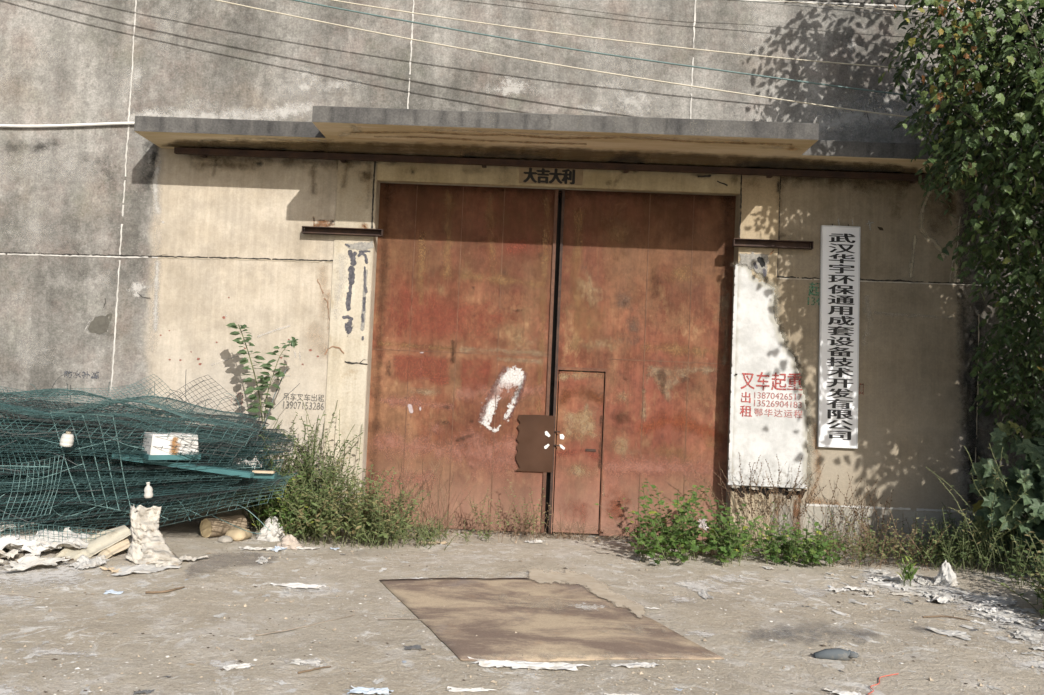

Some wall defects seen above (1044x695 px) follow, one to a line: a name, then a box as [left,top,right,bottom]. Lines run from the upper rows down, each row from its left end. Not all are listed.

damp [147,126,924,241]
spalling [739,250,774,277]